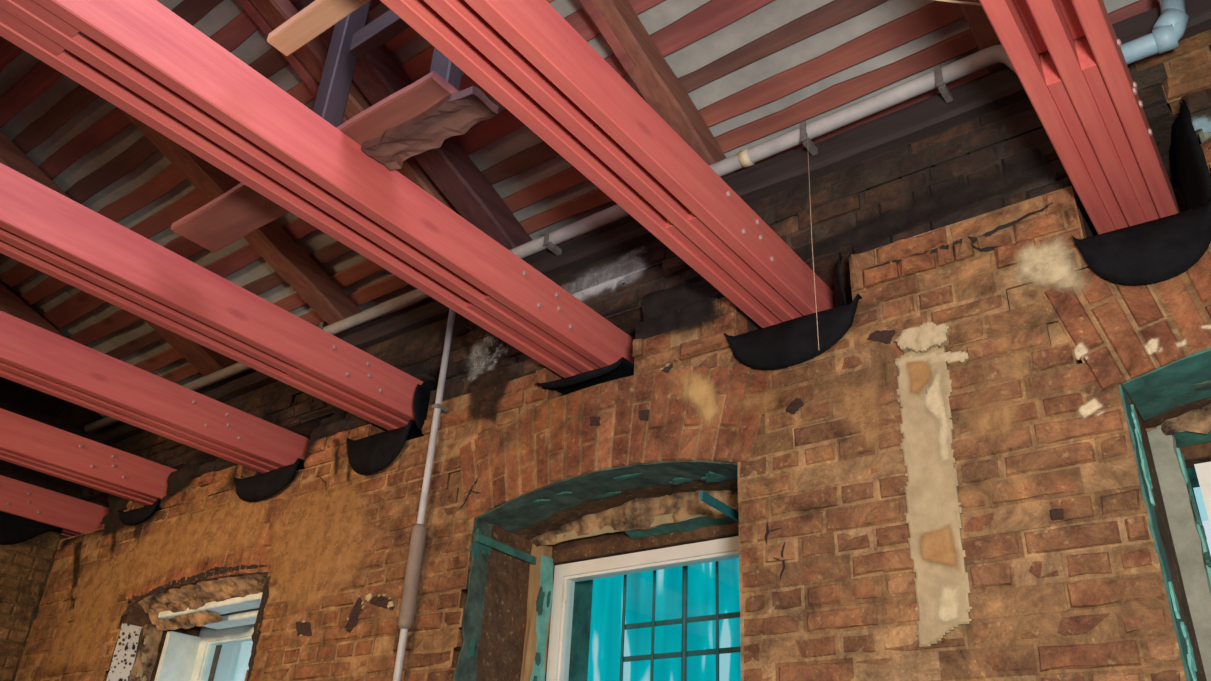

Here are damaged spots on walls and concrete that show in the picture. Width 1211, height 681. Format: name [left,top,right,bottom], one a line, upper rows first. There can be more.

crack [764,522,785,580]
spalling [344,593,395,633]
peeling [106,623,163,681]